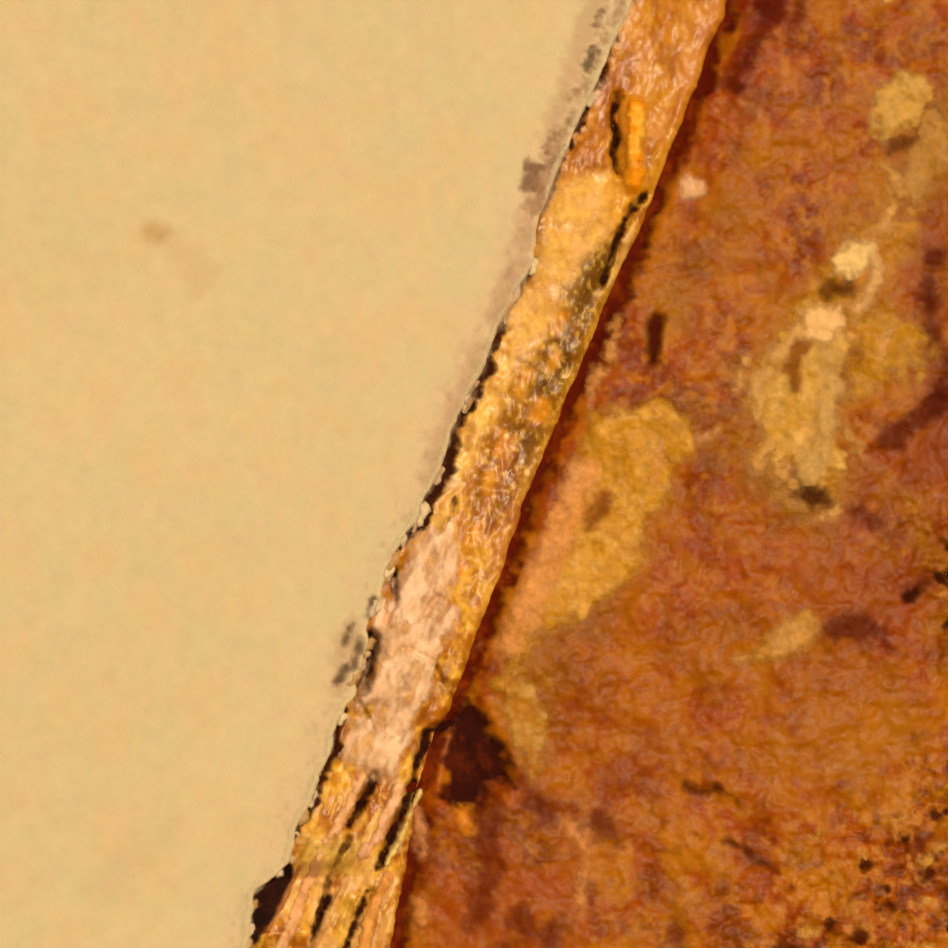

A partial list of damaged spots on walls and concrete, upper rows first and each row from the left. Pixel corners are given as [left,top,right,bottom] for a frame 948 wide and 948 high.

rust [728,0,786,93]
peeling [733,71,948,520]
flaking render [246,0,729,948]
crack [343,0,737,948]
peeling [733,610,819,662]
spalling [904,590,918,602]
crack [294,630,377,838]
crack [310,774,378,941]
crack [728,840,764,864]
rust [859,854,873,870]
rust [919,844,946,883]
rust [798,917,835,938]